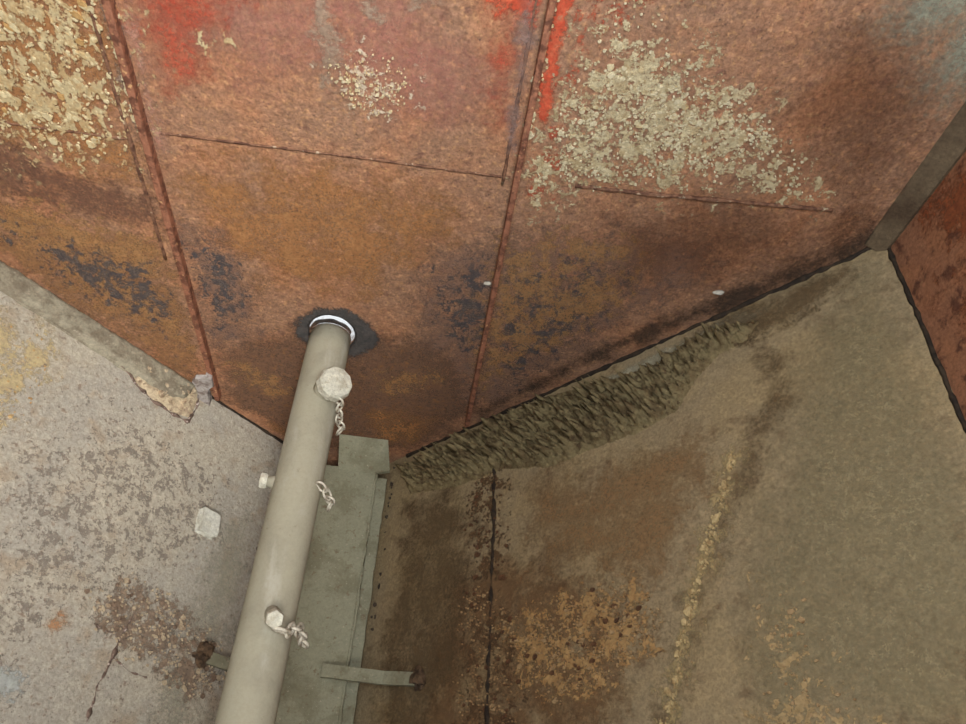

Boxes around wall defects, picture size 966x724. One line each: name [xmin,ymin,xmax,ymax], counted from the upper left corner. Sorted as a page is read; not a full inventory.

corrosion [0,0,137,184]
peeling [0,0,165,181]
peeling [195,29,236,59]
peeling [485,0,542,28]
peeling [505,0,838,226]
corrosion [0,195,198,381]
corrosion [221,320,318,432]
corrosion [330,328,468,448]
leakage [409,216,871,413]
corrosion [84,572,227,702]
corrosion [451,466,665,724]
leakage [652,445,757,724]